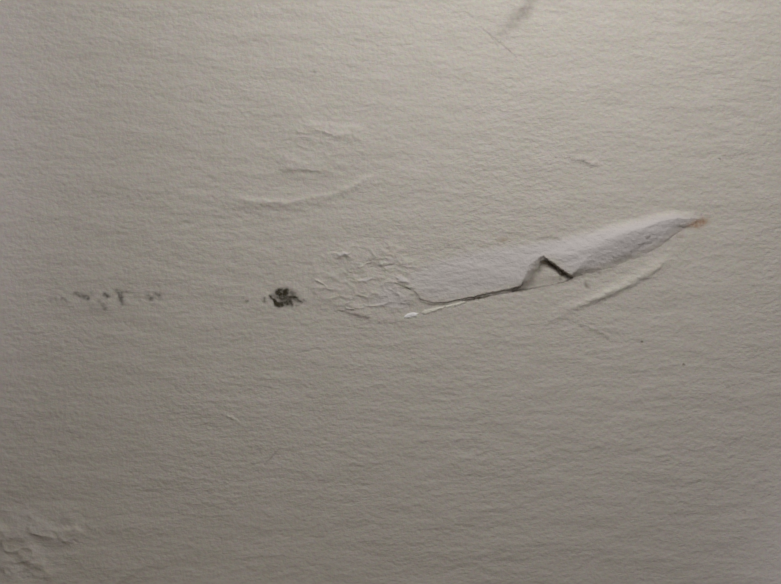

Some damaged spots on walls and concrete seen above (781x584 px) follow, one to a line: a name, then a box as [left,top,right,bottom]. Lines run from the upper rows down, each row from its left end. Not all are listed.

crack [540,260,572,279]
crack [403,295,490,319]